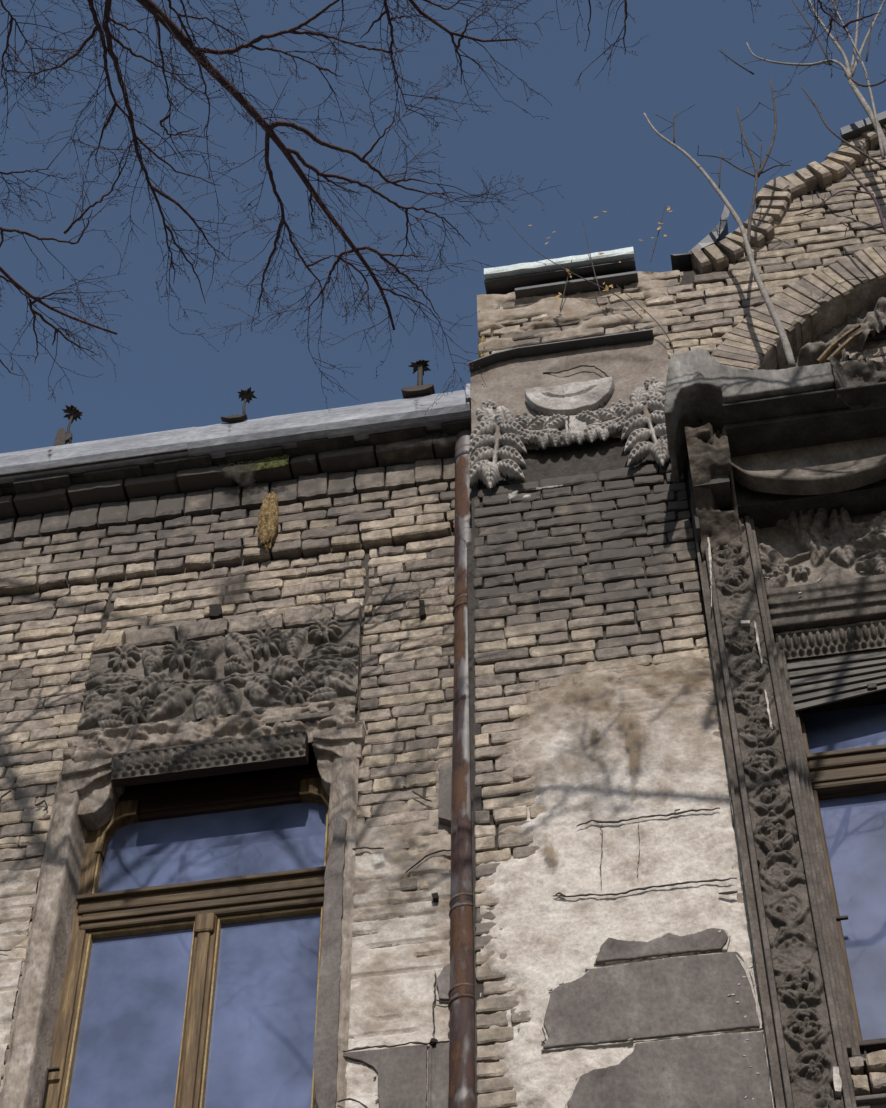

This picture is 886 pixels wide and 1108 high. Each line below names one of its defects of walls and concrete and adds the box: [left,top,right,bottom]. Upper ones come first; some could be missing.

peeling [740,620,763,666]
rust [448,454,475,1108]
leakage [617,713,646,775]
leakage [544,844,557,863]
peeling [479,645,776,1108]
crack [553,808,738,897]
peeling [343,739,452,1108]
crack [343,969,449,1052]
crack [337,1098,368,1108]